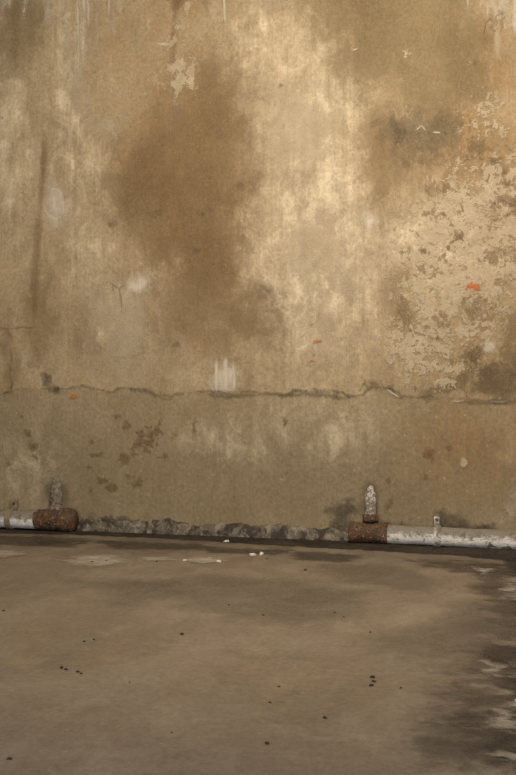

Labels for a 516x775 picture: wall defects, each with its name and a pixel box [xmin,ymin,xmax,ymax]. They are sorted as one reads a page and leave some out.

water stain [151,0,198,104]
peeling [381,95,516,393]